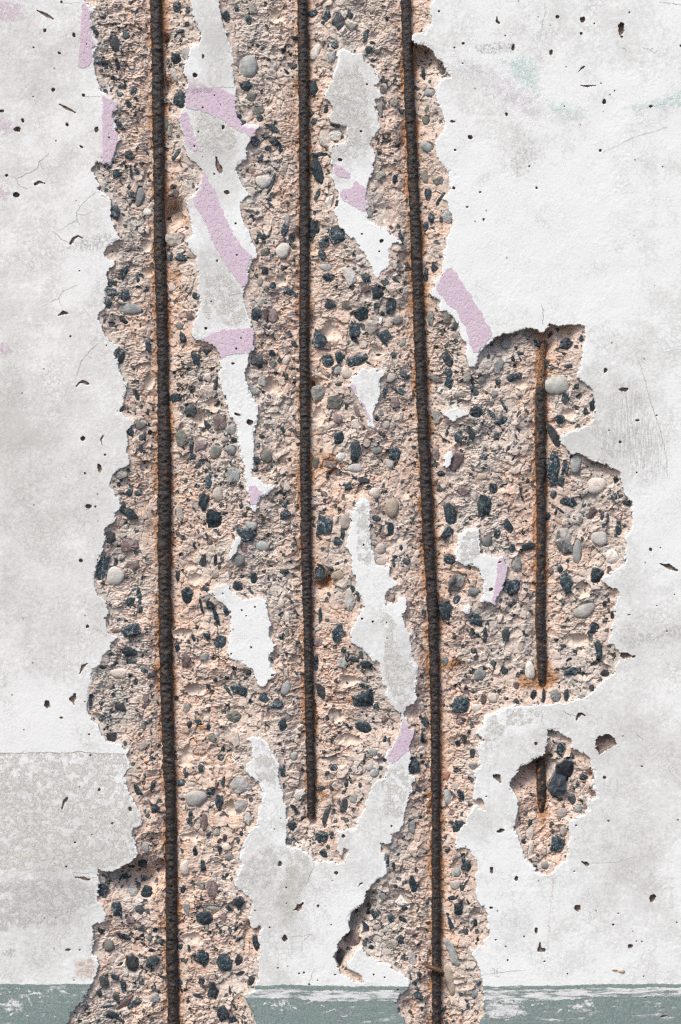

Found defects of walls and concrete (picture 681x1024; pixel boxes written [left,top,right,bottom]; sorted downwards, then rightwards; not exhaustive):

corrosion [295,28,312,235]
corrosion [151,228,179,376]
corrosion [406,213,427,336]
spalling [0,0,442,1024]
corrosion [299,529,334,590]
corrosion [297,453,338,516]
corrosion [418,458,459,686]
spalling [400,0,633,1024]
corrosion [532,451,549,595]
corrosion [155,602,178,742]
corrosion [519,658,559,690]
corrosion [428,699,445,958]